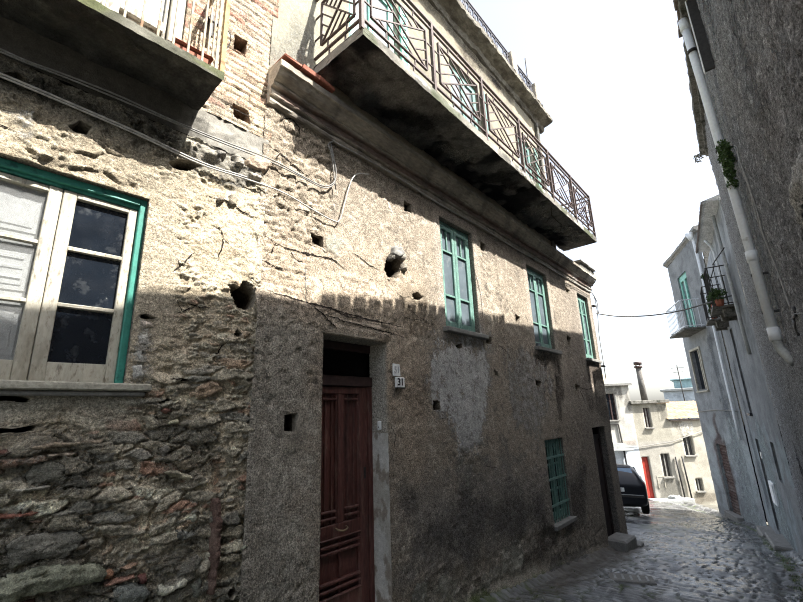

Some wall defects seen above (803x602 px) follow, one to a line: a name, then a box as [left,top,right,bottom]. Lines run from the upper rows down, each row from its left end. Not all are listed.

crack [263,236,426,339]
hole [0,396,40,405]
spalling [0,422,114,495]
spalling [147,393,219,486]
spalling [0,505,202,602]